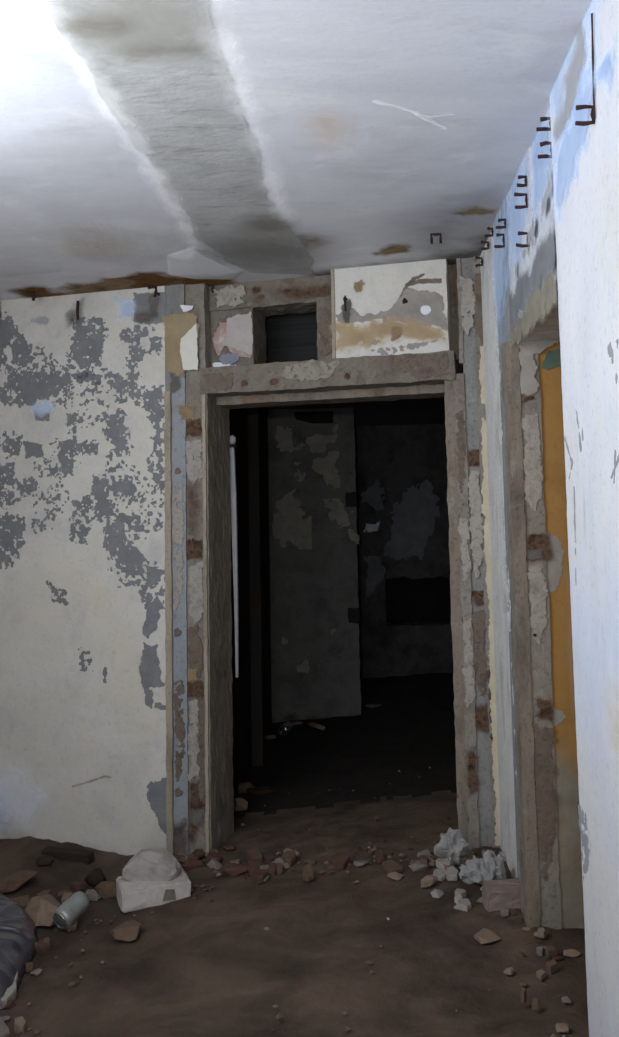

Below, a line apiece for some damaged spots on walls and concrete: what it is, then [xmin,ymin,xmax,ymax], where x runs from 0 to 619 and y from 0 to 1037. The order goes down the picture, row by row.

corrosion [13,273,235,298]
peeling [212,346,252,367]
peeling [279,288,450,381]
spalling [459,273,501,404]
peeling [0,292,204,834]
peeling [272,424,440,600]
peeling [455,404,504,846]
spalling [521,413,543,511]
spalling [527,533,564,644]